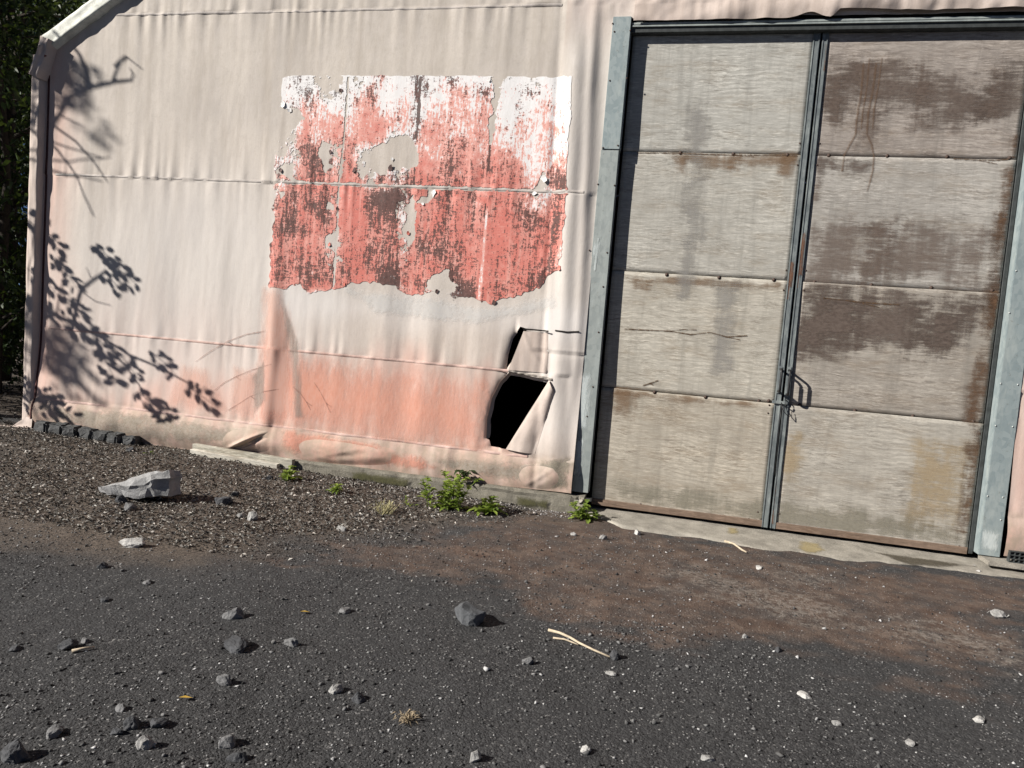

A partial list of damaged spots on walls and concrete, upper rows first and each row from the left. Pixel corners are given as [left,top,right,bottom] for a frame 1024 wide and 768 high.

water stain [824,59,1024,138]
peeling [268,75,572,305]
crack [625,328,747,340]
water stain [797,223,997,361]